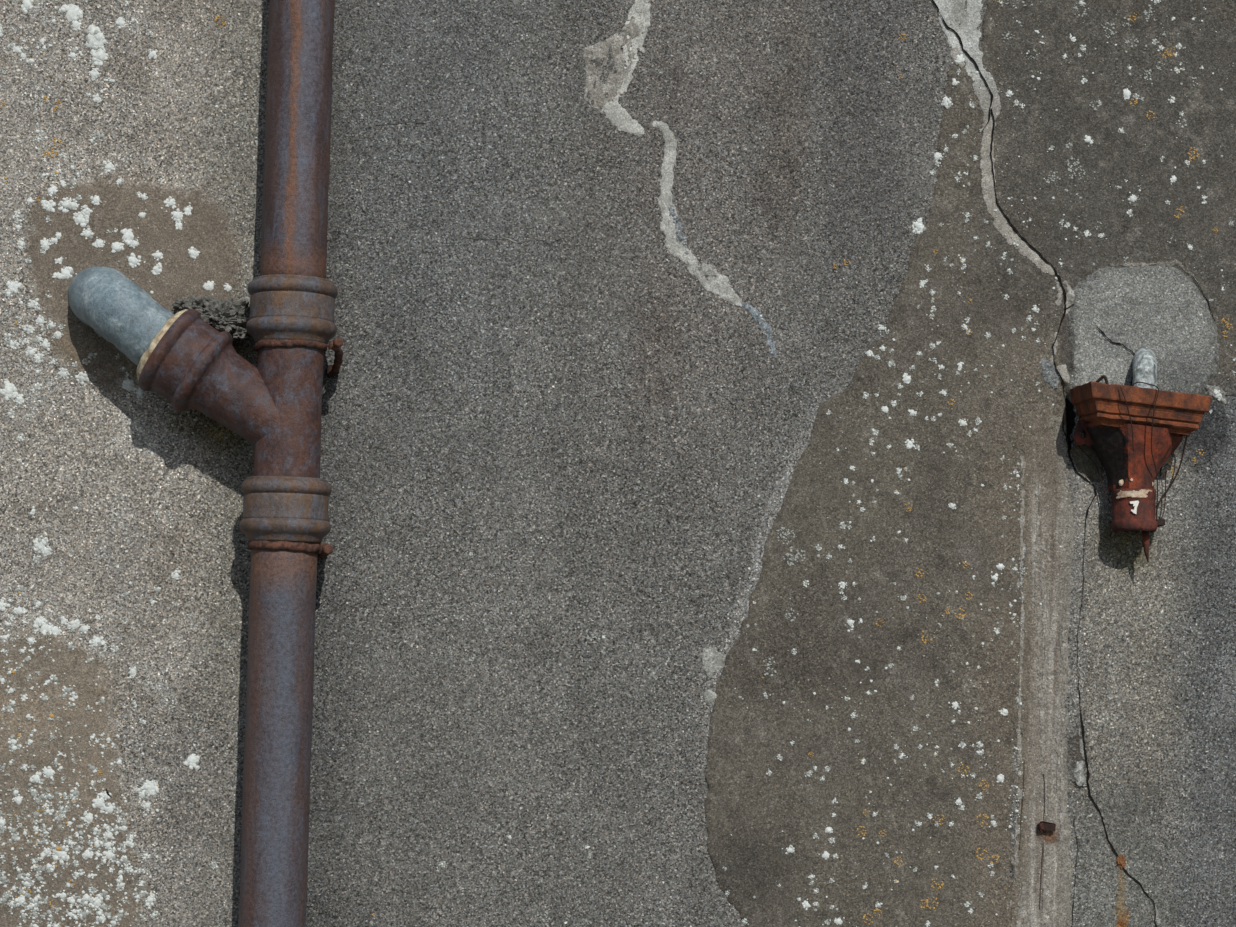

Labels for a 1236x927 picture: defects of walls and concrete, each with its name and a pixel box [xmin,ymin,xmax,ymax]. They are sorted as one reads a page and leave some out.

crack [583,0,777,358]
spalling [1040,358,1070,390]
crack [932,0,1157,927]
spalling [701,645,725,703]
spalling [1071,728,1090,788]